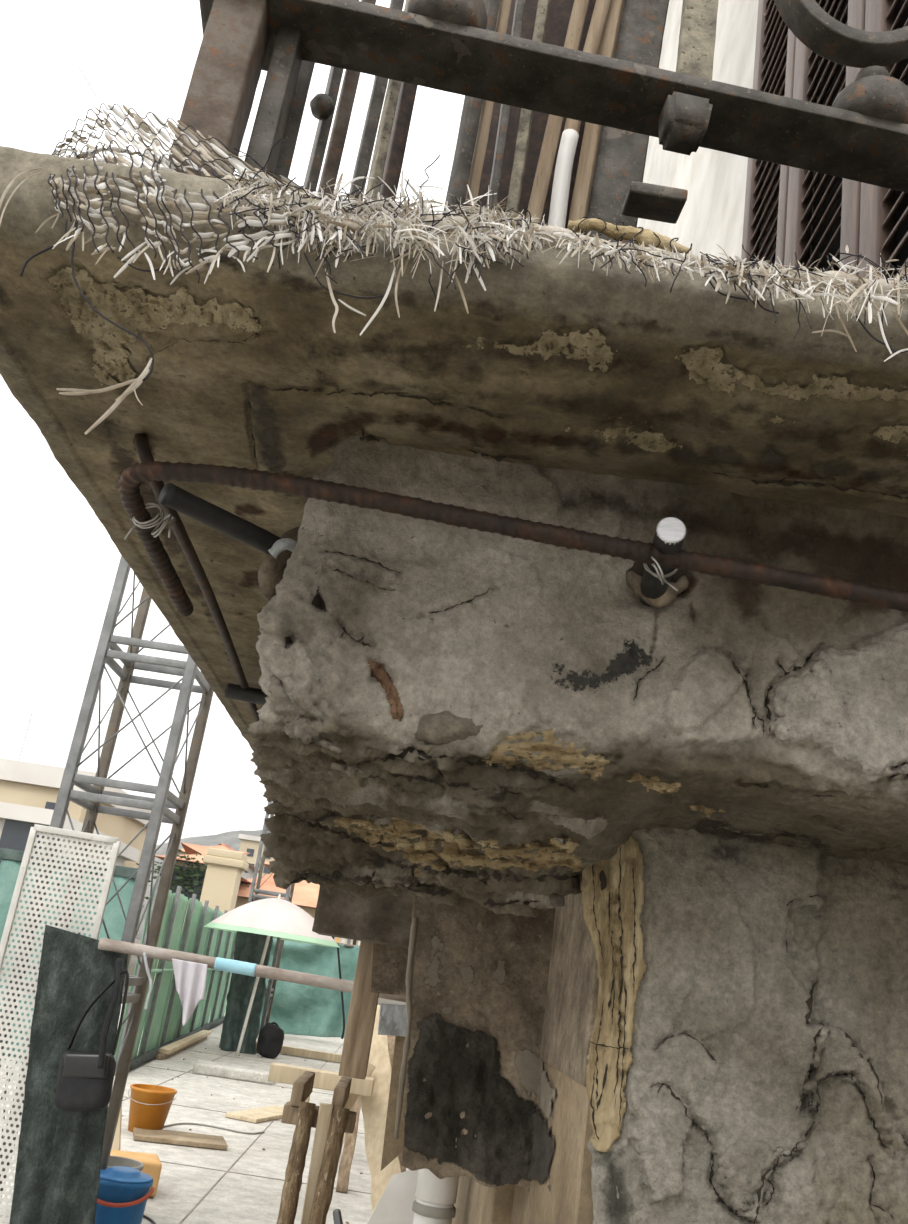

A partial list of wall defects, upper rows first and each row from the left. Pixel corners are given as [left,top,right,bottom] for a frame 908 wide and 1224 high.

leakage [200,253,241,270]
spalling [46,266,262,388]
spalling [462,328,618,373]
leakage [482,339,635,371]
rust [308,412,586,457]
rust [232,572,259,597]
spalling [118,434,908,781]
rust [677,577,696,622]
mould [551,639,658,693]
crack [732,648,819,734]
spalling [323,817,647,1153]
crack [651,938,908,1224]